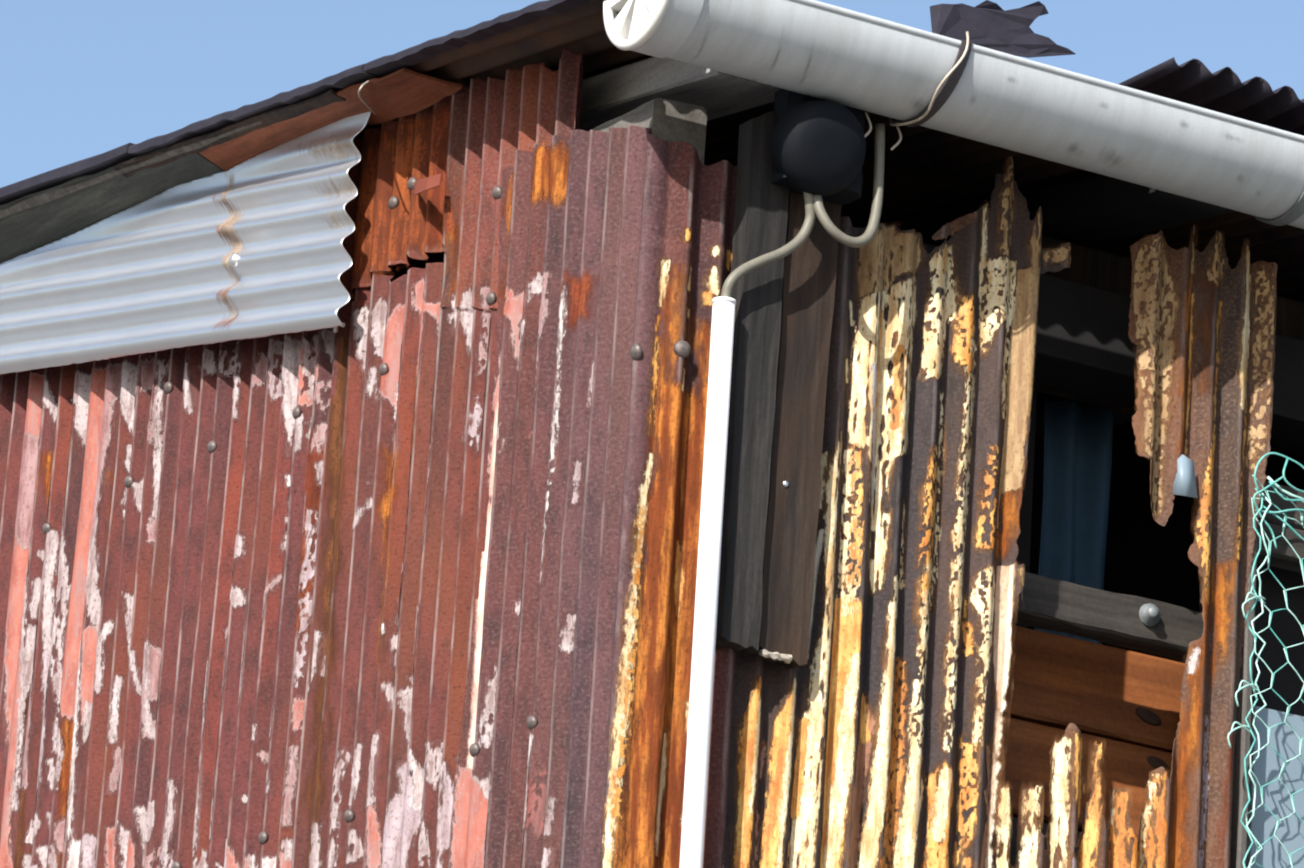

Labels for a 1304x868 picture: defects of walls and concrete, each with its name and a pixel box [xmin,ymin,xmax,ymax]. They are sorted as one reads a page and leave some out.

corrosion [351,105,460,295]
corrosion [531,144,570,203]
corrosion [565,274,592,326]
corrosion [1178,268,1217,453]
peeling [0,329,335,868]
corrosion [295,333,349,868]
peeling [309,272,567,868]
corrosion [611,267,711,868]
peeling [723,156,1167,868]
corrosion [996,490,1021,559]
corrosion [14,776,24,868]
corrosion [59,719,74,822]